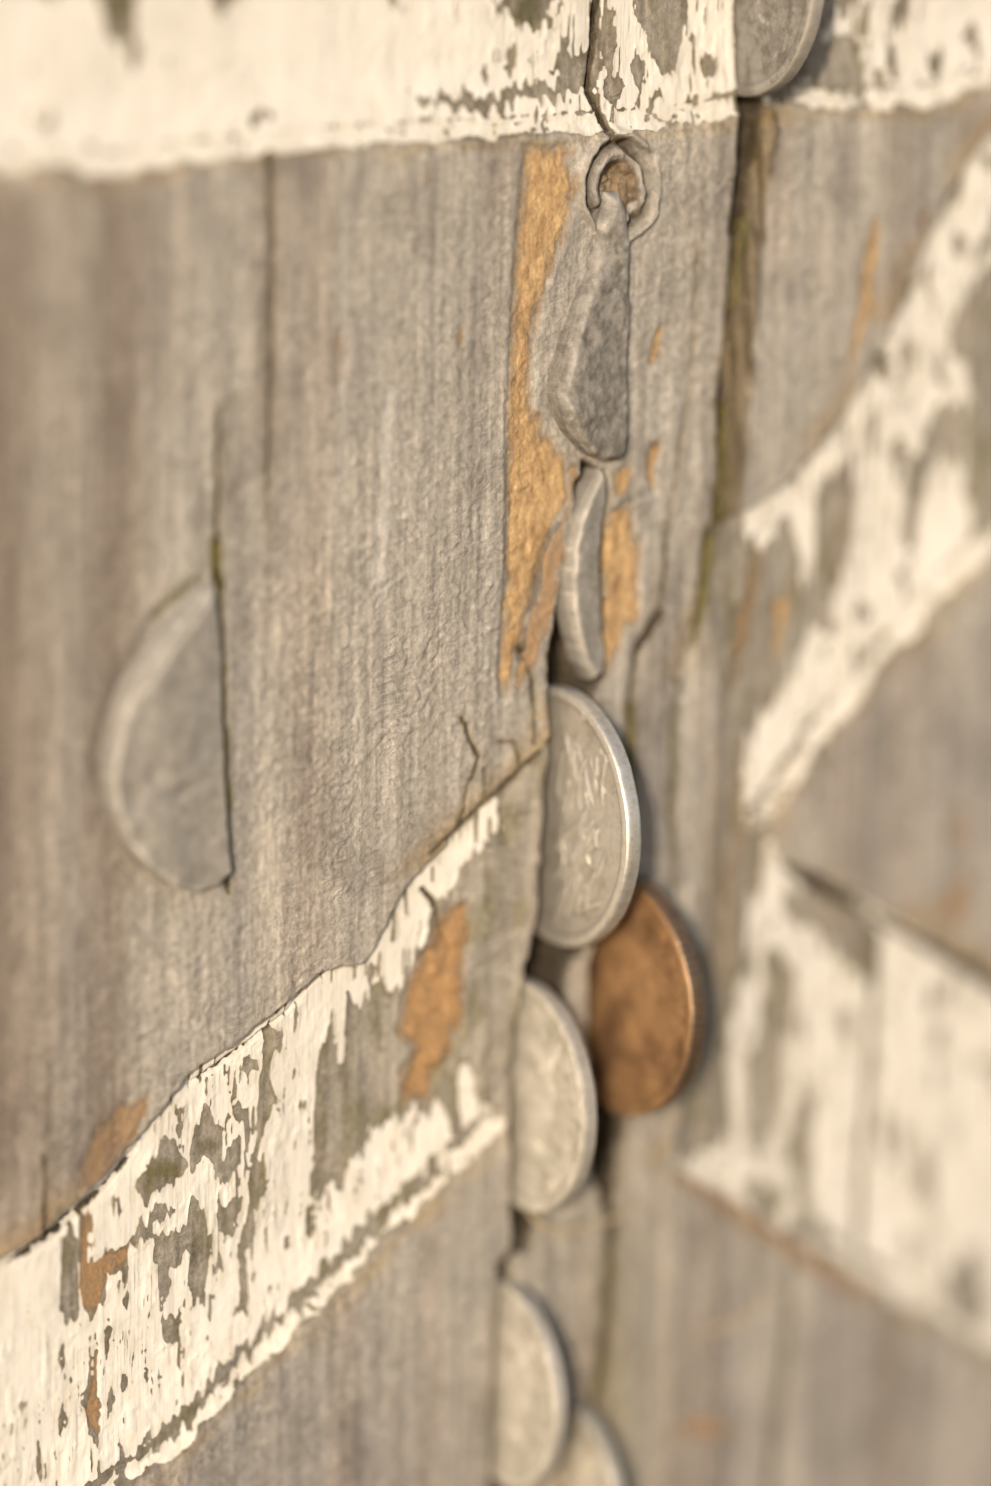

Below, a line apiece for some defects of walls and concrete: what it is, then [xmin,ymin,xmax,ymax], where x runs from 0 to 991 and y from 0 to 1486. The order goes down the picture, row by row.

peeling [760,0,991,112]
peeling [0,0,739,690]
crack [573,461,601,491]
crack [687,95,758,534]
crack [433,539,700,851]
peeling [670,132,991,1349]
crack [8,1156,129,1263]
crack [188,973,321,1083]
peeling [0,798,512,1486]
crack [496,1201,537,1279]
crack [523,930,582,1003]
crack [588,1100,624,1413]